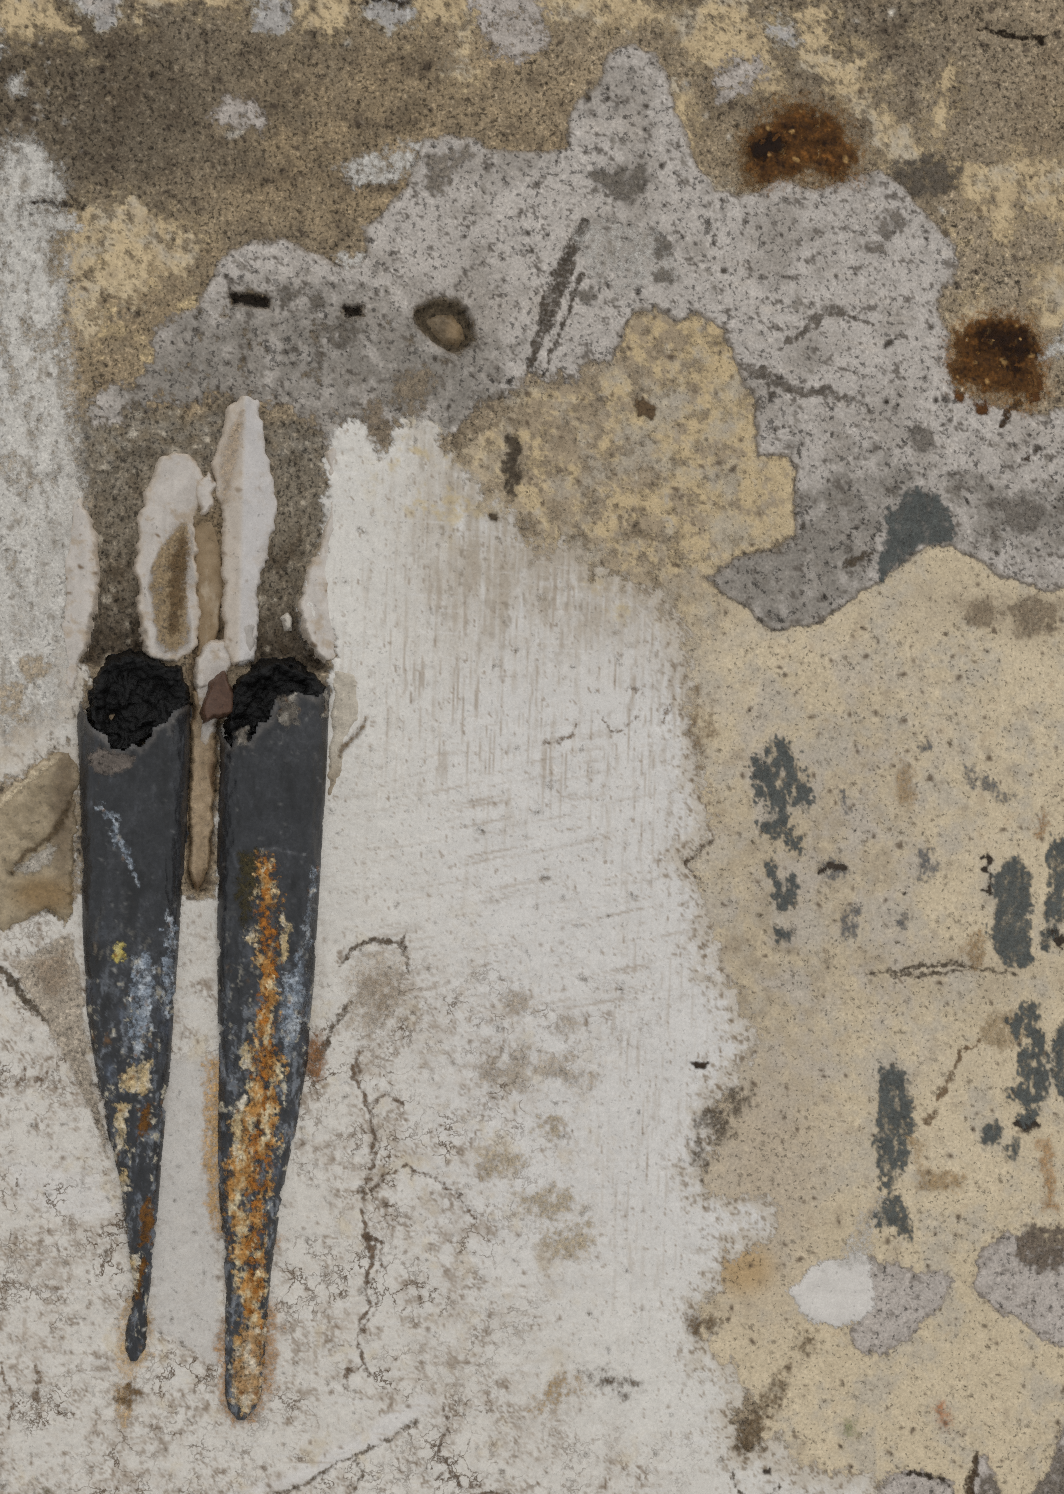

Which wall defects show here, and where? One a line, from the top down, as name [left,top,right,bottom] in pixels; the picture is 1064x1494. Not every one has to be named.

rust [742,94,865,187]
rust [946,311,1050,415]
peeling [324,448,337,475]
peeling [132,396,277,707]
peeling [280,613,292,631]
peeling [296,502,336,663]
peeling [200,717,227,750]
crack [339,936,409,971]
rust [138,1105,151,1136]
rust [201,847,327,1423]
crack [315,1001,477,1379]
rust [113,1197,155,1428]